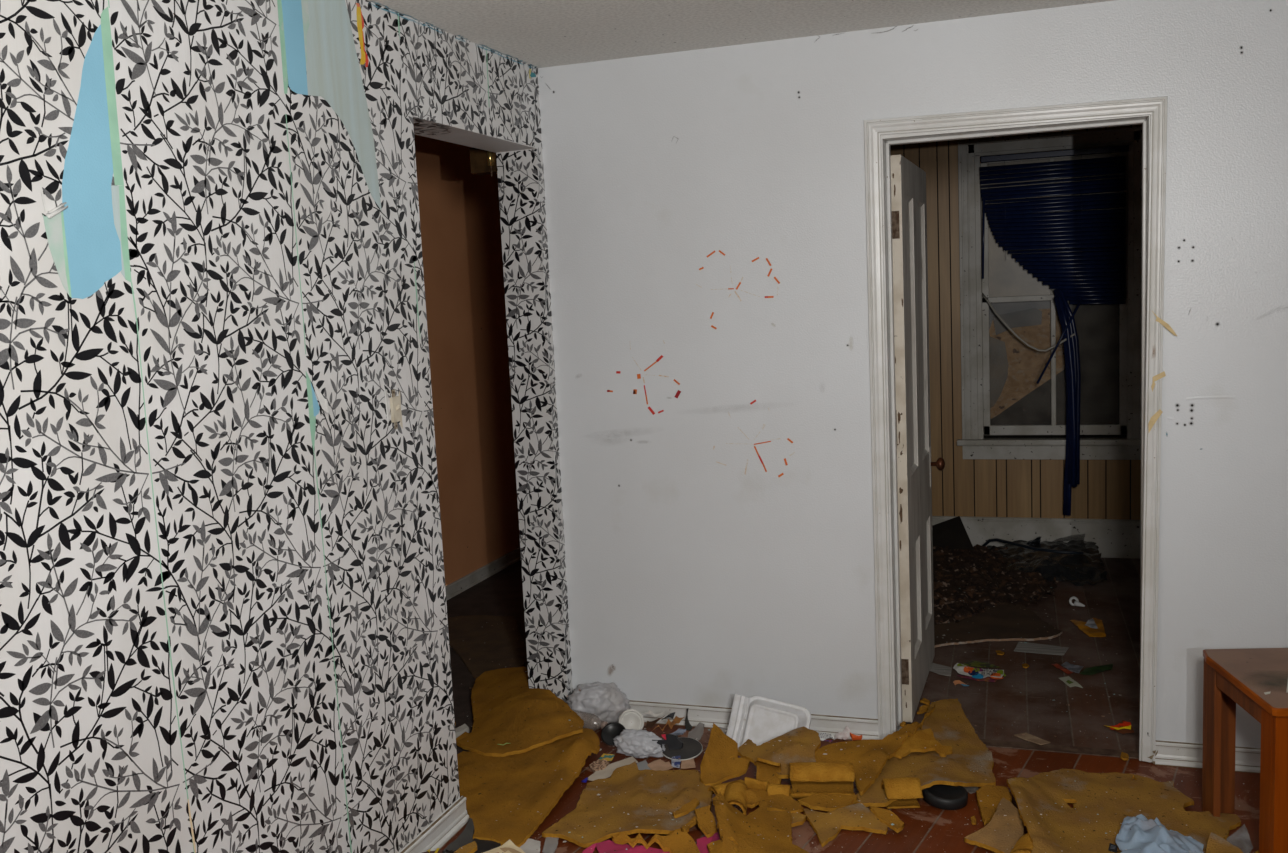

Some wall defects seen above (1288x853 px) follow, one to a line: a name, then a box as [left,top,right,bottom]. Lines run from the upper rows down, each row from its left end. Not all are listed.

peeling [356,3,369,67]